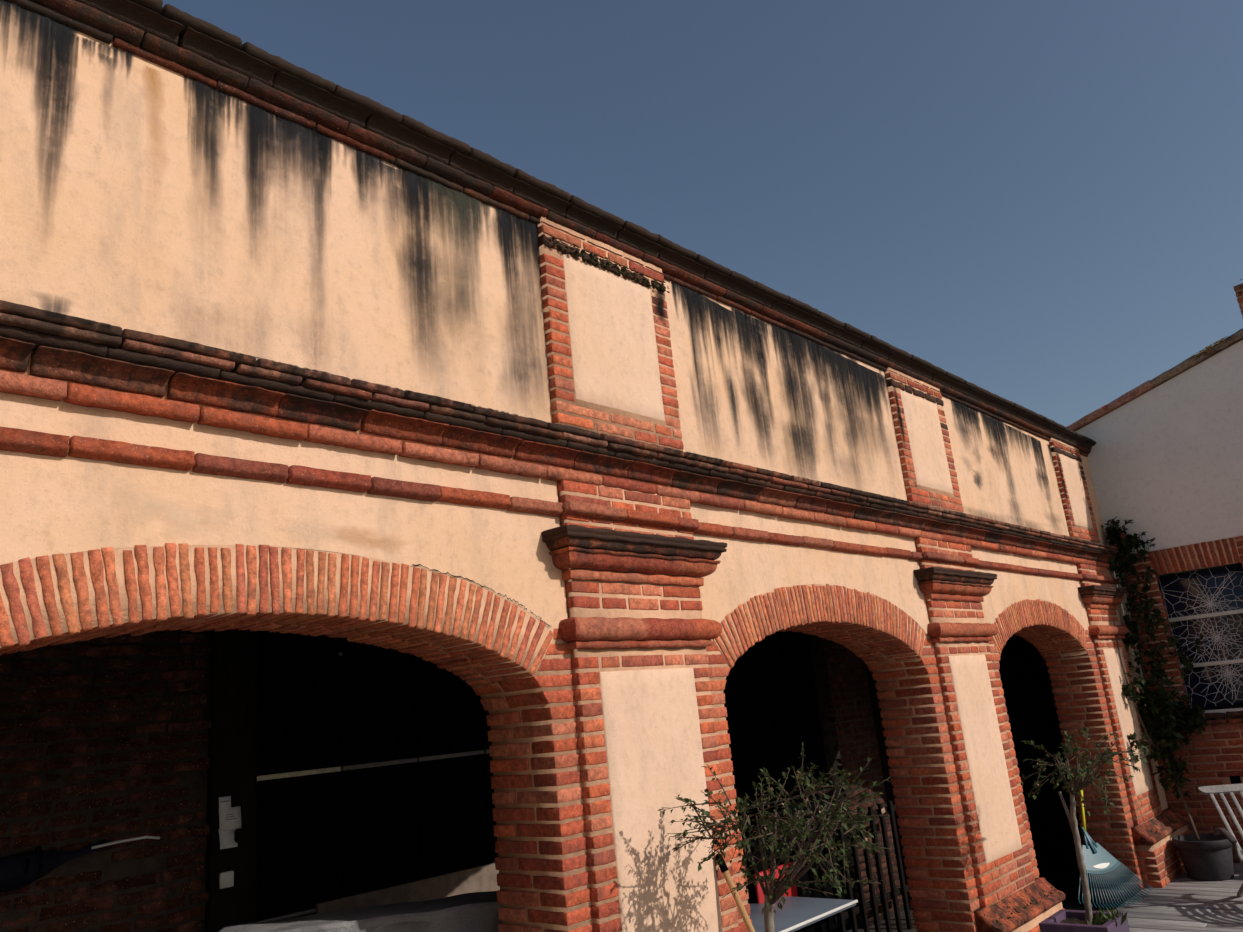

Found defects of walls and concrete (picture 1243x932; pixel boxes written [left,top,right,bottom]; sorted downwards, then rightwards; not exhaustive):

damp [0,0,133,124]
damp [184,76,540,264]
damp [657,281,903,428]
damp [951,400,1065,487]